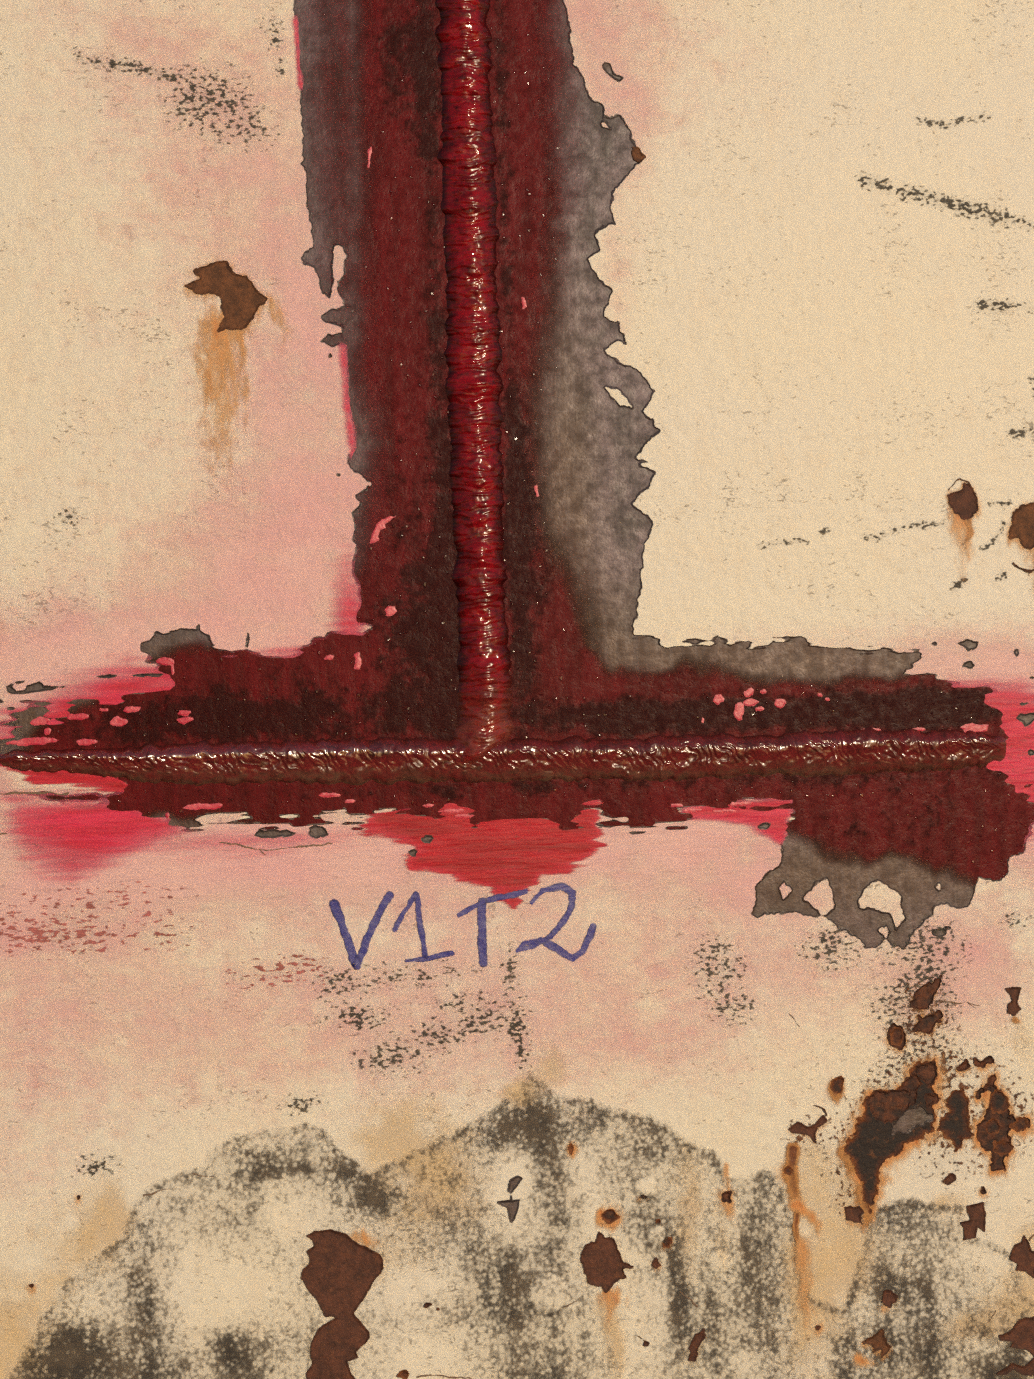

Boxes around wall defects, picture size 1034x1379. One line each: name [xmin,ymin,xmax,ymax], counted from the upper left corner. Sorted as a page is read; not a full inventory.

peeling [602,62,624,82]
corrosion [185,260,283,445]
corrosion [947,478,979,558]
corrosion [1007,502,1034,573]
mould [12,1212,315,1379]
corrosion [301,1229,384,1379]
mould [177,1078,797,1379]
corrosion [580,1207,634,1356]
corrosion [781,975,1034,1347]
mould [806,1199,1034,1379]
corrosion [953,1235,1034,1376]